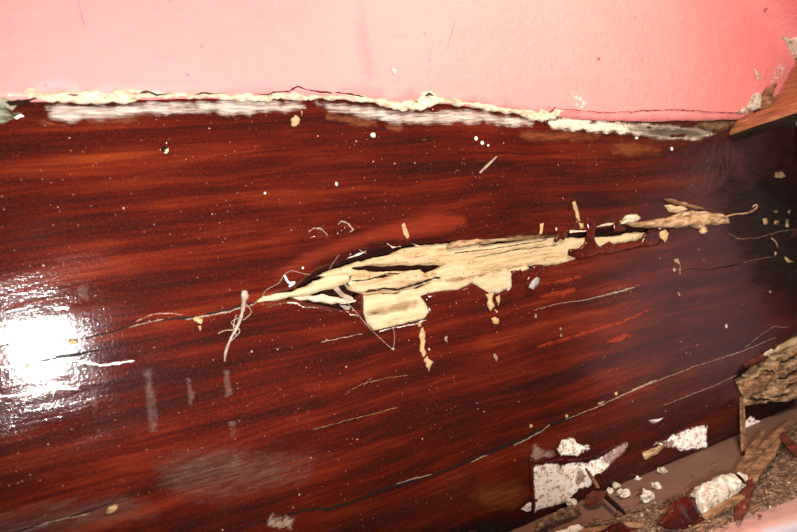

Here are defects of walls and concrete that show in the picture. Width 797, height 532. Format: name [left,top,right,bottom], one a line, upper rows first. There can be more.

peeling [5,87,566,127]
spalling [446,237,515,249]
peeling [744,336,797,402]
crack [239,326,788,528]
peeling [642,426,707,460]
peeling [521,438,627,512]
peeling [599,522,638,532]
peeling [657,497,704,530]